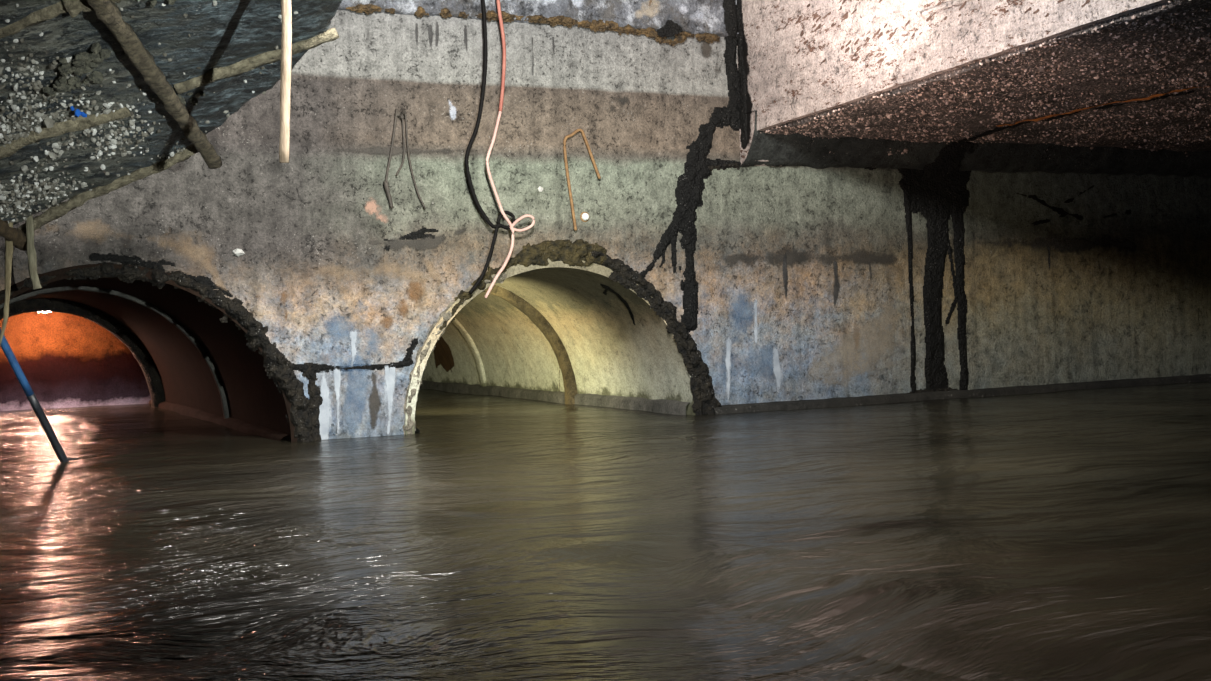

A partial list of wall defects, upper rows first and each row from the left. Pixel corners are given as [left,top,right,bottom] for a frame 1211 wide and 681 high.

rust [346,4,395,15]
rust [415,6,720,43]
crack [705,0,753,171]
damp [725,142,979,399]
crack [292,338,418,441]
damp [319,318,396,440]